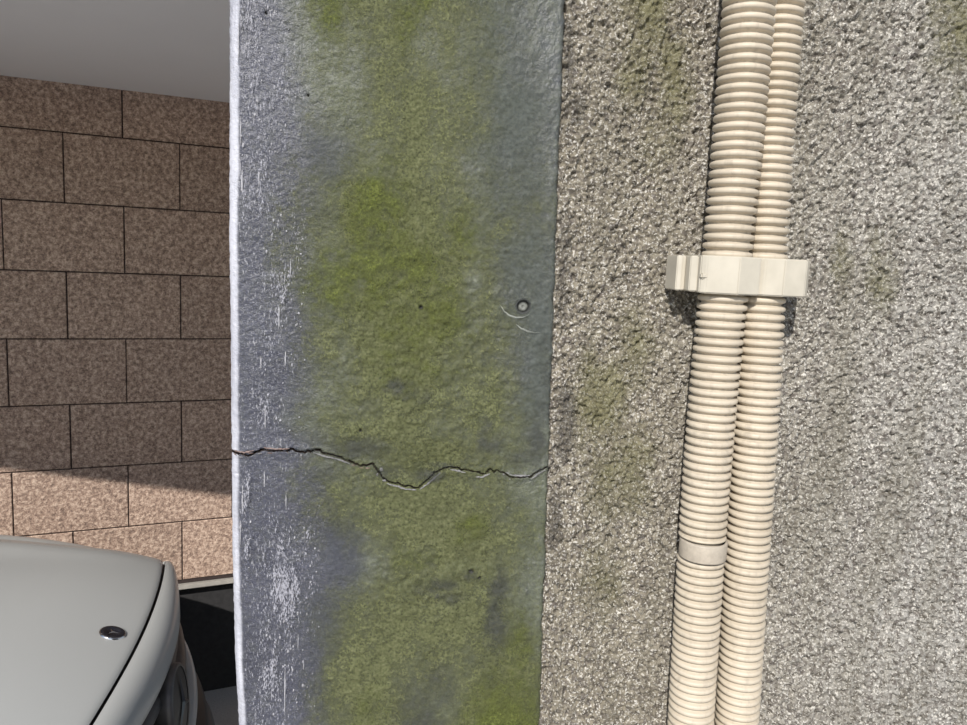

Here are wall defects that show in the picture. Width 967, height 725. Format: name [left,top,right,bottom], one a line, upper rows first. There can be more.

crack [232,447,547,491]